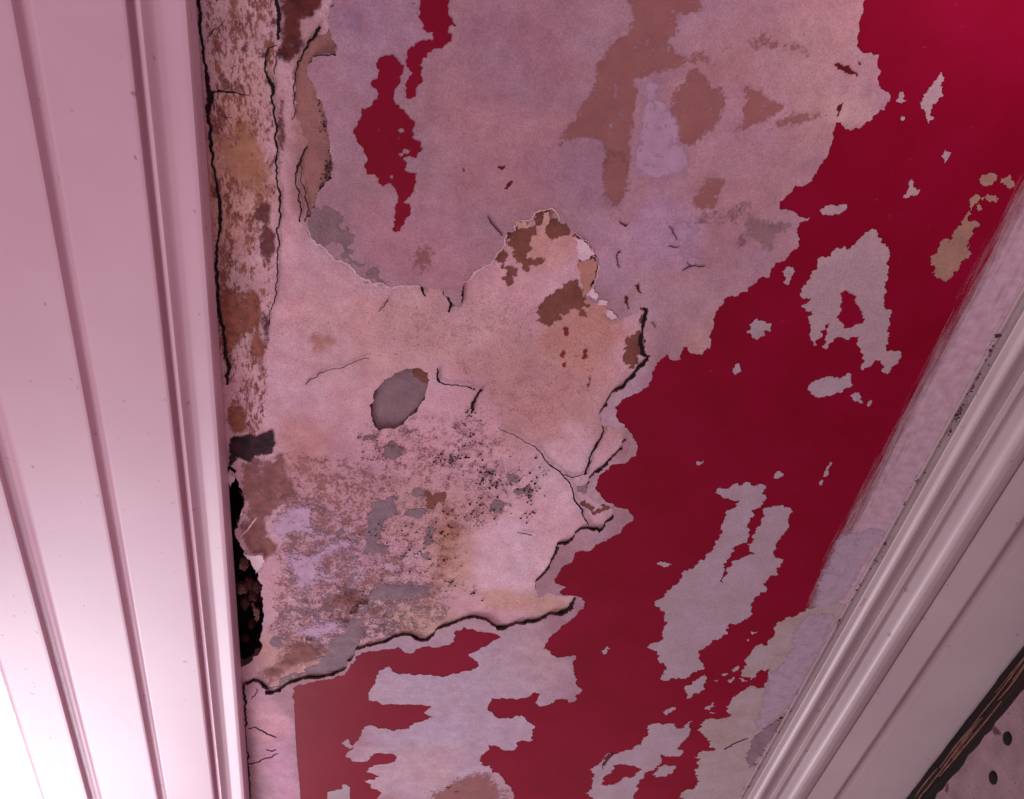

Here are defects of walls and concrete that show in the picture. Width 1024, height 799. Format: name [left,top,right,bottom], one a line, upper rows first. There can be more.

crack [196,0,321,385]
crack [305,358,369,385]
water stain [228,408,549,683]
crack [436,368,483,414]
peeling [197,0,906,799]
crack [499,307,655,582]
crack [668,226,705,271]
peeling [930,173,1015,282]